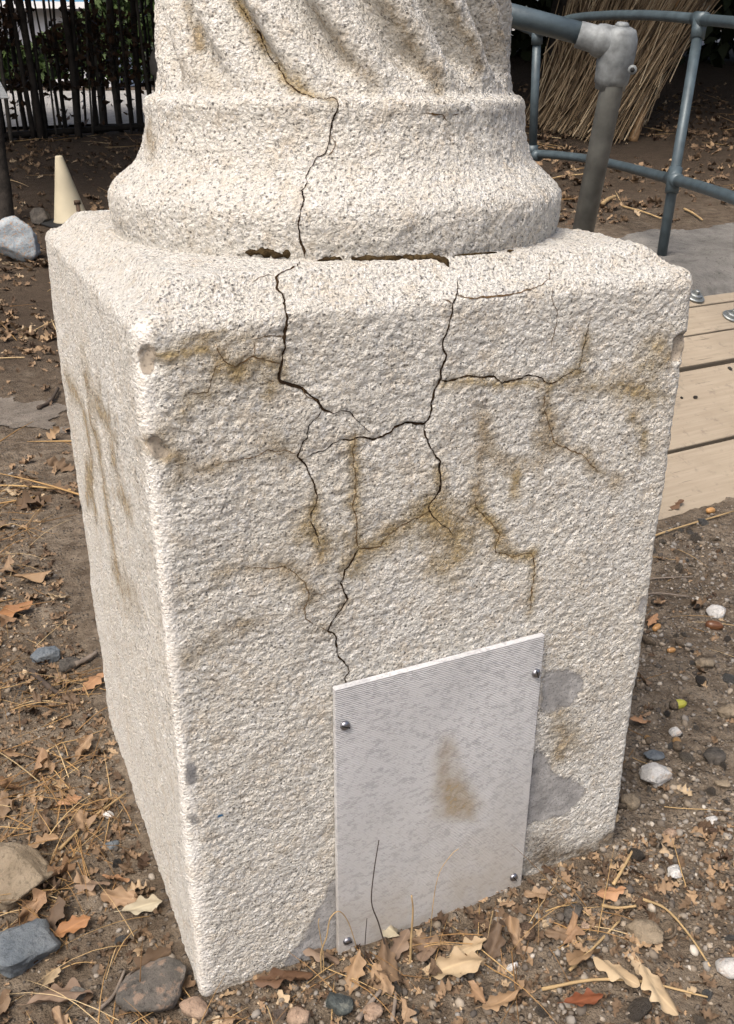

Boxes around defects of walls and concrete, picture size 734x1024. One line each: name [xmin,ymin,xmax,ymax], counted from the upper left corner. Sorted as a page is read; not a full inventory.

spalling [138,347,155,374]
crack [191,2,600,683]